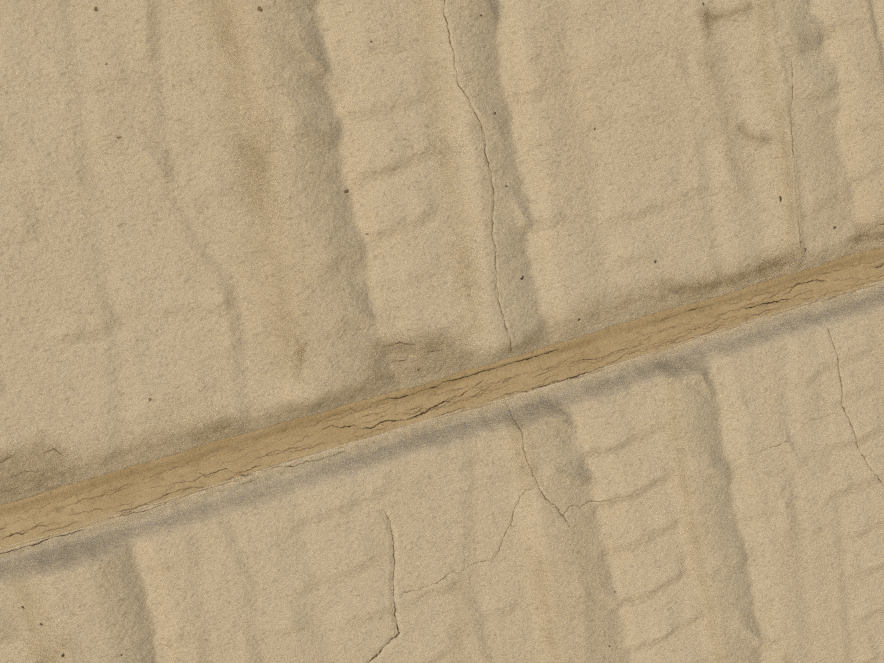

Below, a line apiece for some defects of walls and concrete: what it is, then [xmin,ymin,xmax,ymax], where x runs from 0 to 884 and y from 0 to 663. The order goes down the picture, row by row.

crack [443,0,512,354]
crack [0,257,884,663]